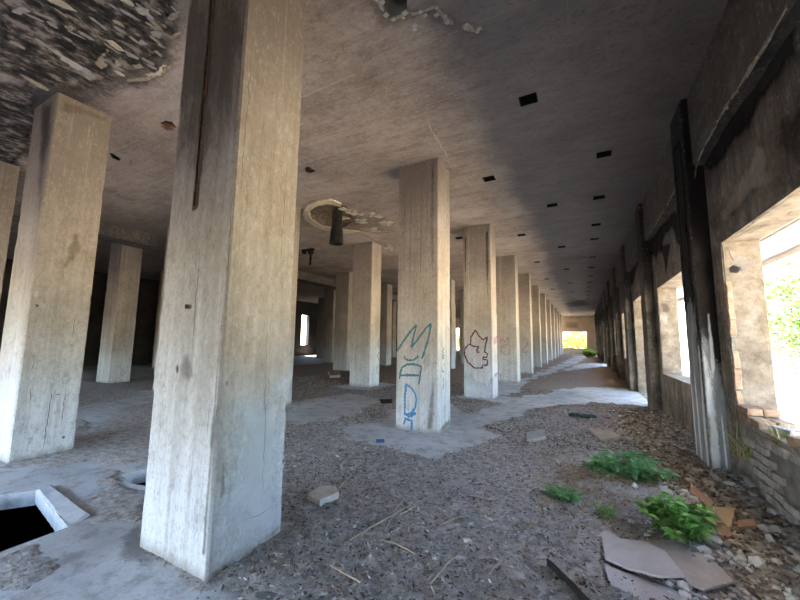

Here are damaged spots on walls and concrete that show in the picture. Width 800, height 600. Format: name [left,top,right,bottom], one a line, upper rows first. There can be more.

peeling [12,0,184,82]
spalling [375,0,481,34]
peeling [20,74,50,91]
corrosion [192,0,215,210]
spalling [302,199,394,234]
crack [43,388,66,448]